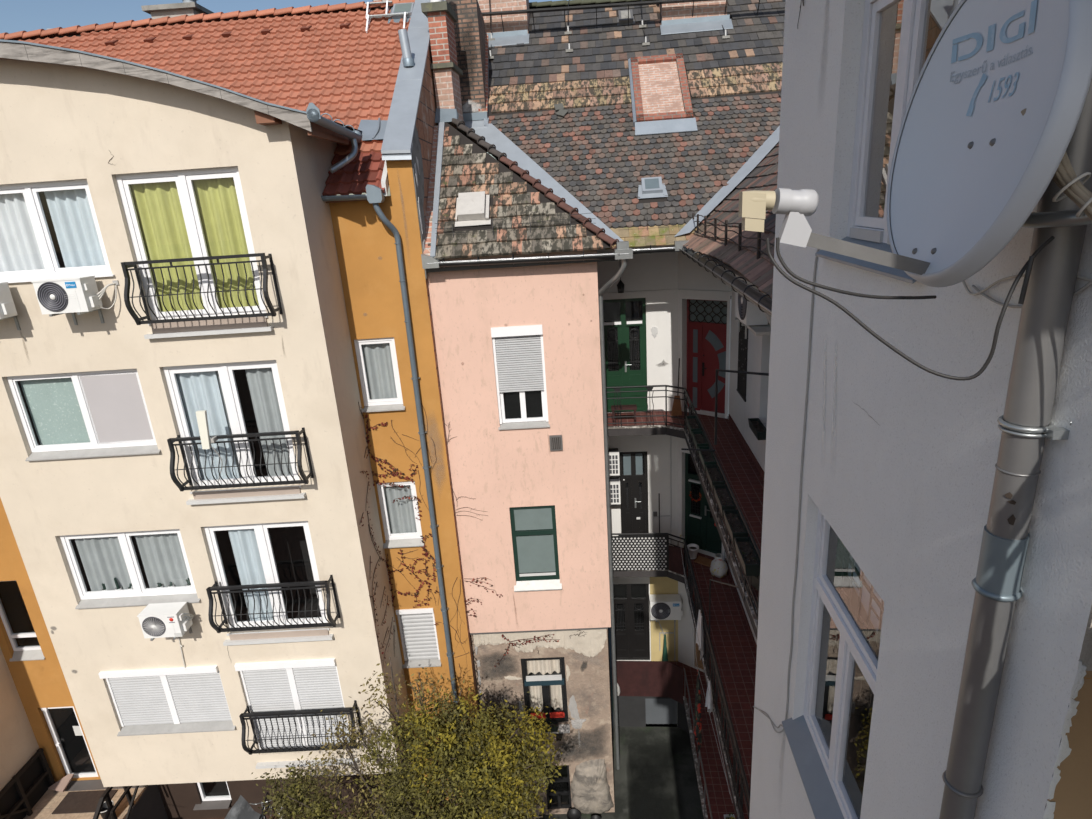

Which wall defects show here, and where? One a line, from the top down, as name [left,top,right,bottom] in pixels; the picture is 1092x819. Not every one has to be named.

damp [483,655,514,678]
peeling [473,629,607,700]
peeling [556,695,586,741]
damp [556,730,603,758]
peeling [1043,660,1087,819]